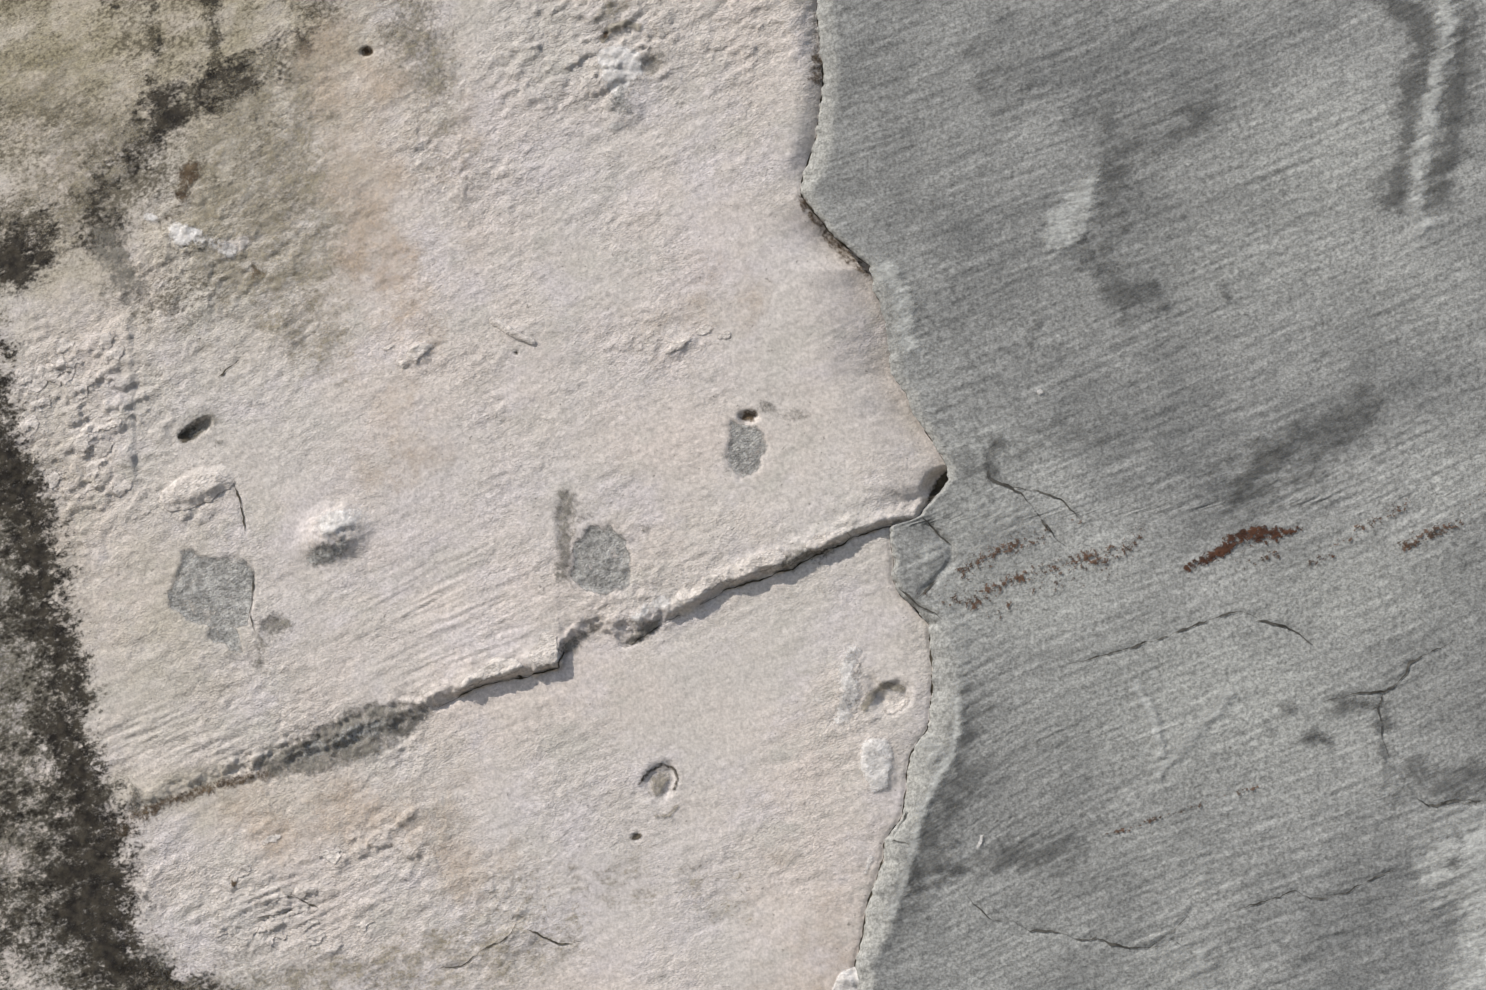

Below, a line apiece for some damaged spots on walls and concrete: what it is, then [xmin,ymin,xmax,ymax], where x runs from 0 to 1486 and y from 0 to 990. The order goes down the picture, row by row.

damp [386,0,454,96]
damp [0,0,346,370]
flaking render [725,403,771,477]
flaking render [167,549,291,667]
crack [234,485,245,534]
flaking render [555,490,631,595]
rust [917,523,1143,619]
rust [1183,525,1303,573]
rust [1398,491,1485,551]
damp [0,340,523,990]
crack [438,652,565,708]
flaking render [859,738,893,792]